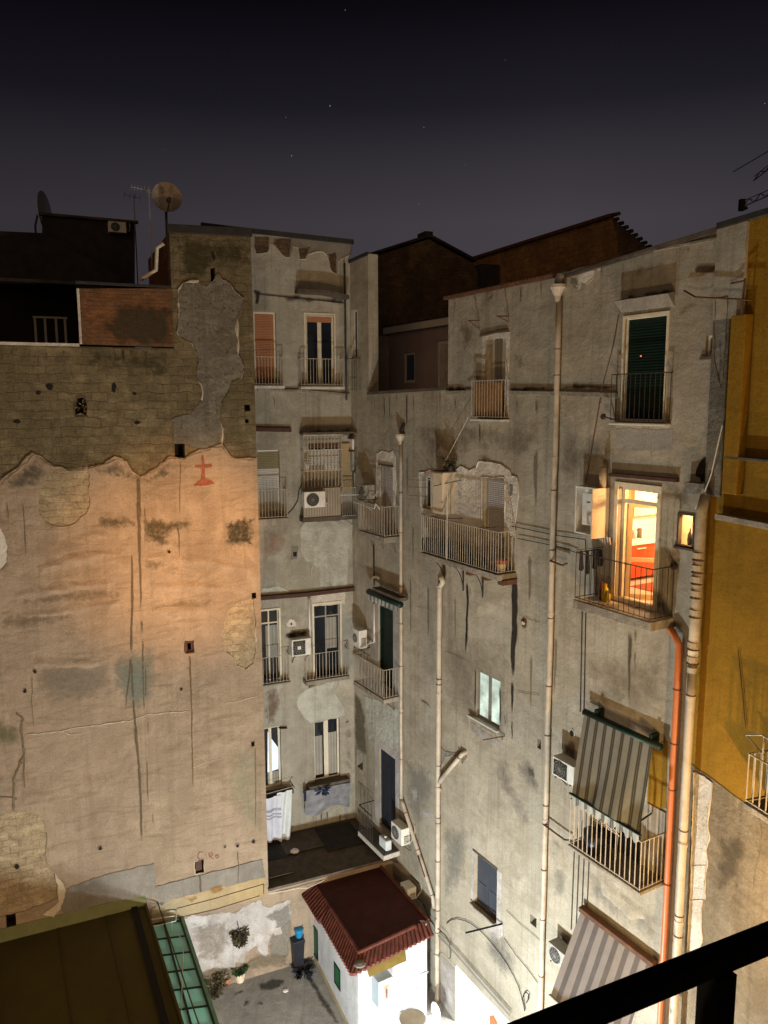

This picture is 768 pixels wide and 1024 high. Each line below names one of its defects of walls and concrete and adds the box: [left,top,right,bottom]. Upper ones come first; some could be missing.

spalling [0,233,352,527]
water stain [228,519,252,544]
spalling [419,460,519,538]
water stain [102,467,188,834]
spalling [222,586,290,669]
water stain [499,559,531,736]
spalling [0,809,59,917]
peeling [185,900,291,973]